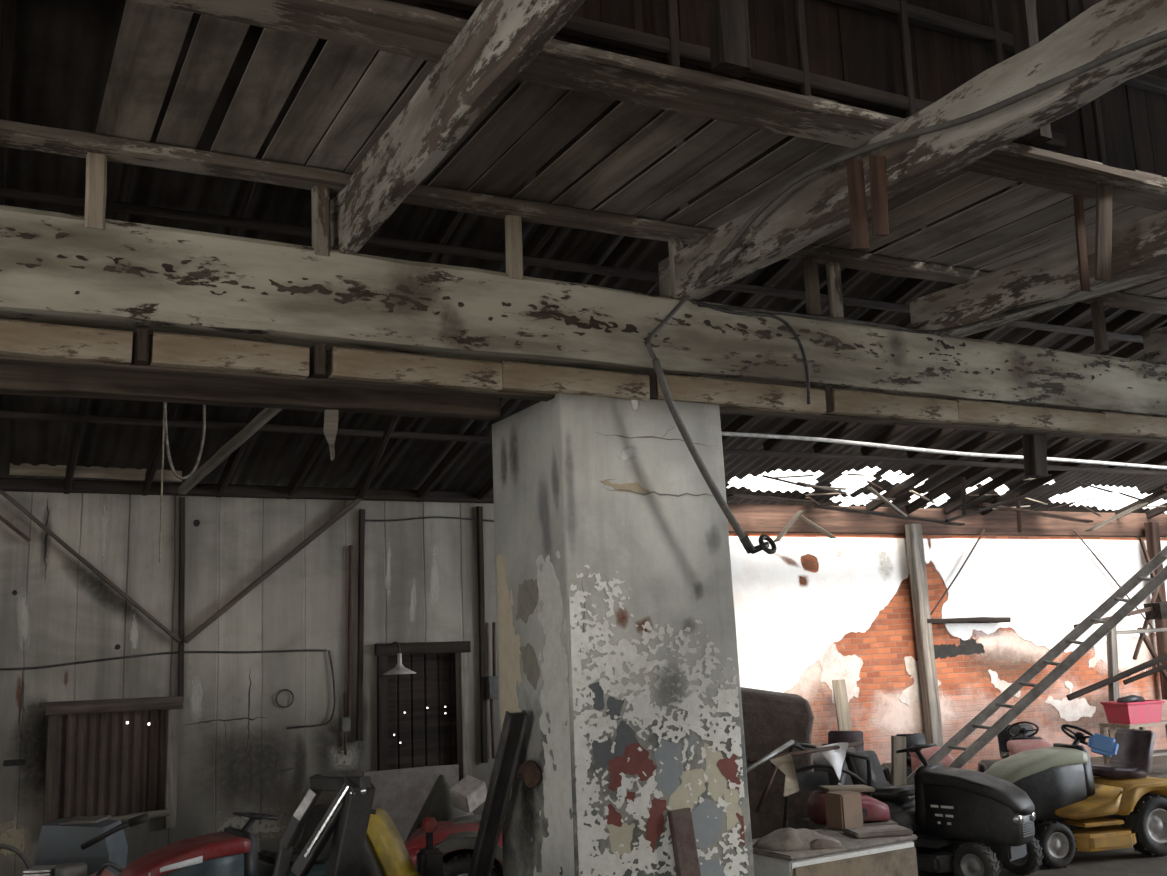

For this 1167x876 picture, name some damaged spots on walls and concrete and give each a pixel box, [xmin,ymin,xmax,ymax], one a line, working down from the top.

peeling [103,256,196,286]
peeling [210,278,464,315]
peeling [526,304,670,341]
peeling [680,314,885,352]
peeling [972,350,1167,381]
crack [596,426,717,447]
crack [601,479,713,497]
flaking render [923,538,1167,668]
peeling [497,536,909,876]
flaking render [898,656,923,706]
flaking render [988,670,1021,698]
flaking render [1045,681,1096,721]